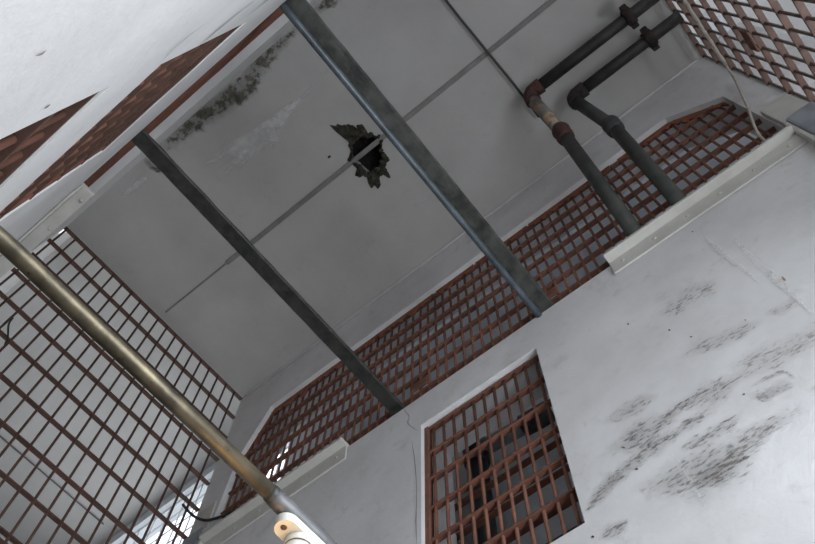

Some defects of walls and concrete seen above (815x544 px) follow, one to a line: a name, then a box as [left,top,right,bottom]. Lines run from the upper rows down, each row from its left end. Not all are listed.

leakage [167,31,295,143]
peeling [347,124,373,182]
leakage [589,376,741,508]
leakage [657,415,785,498]